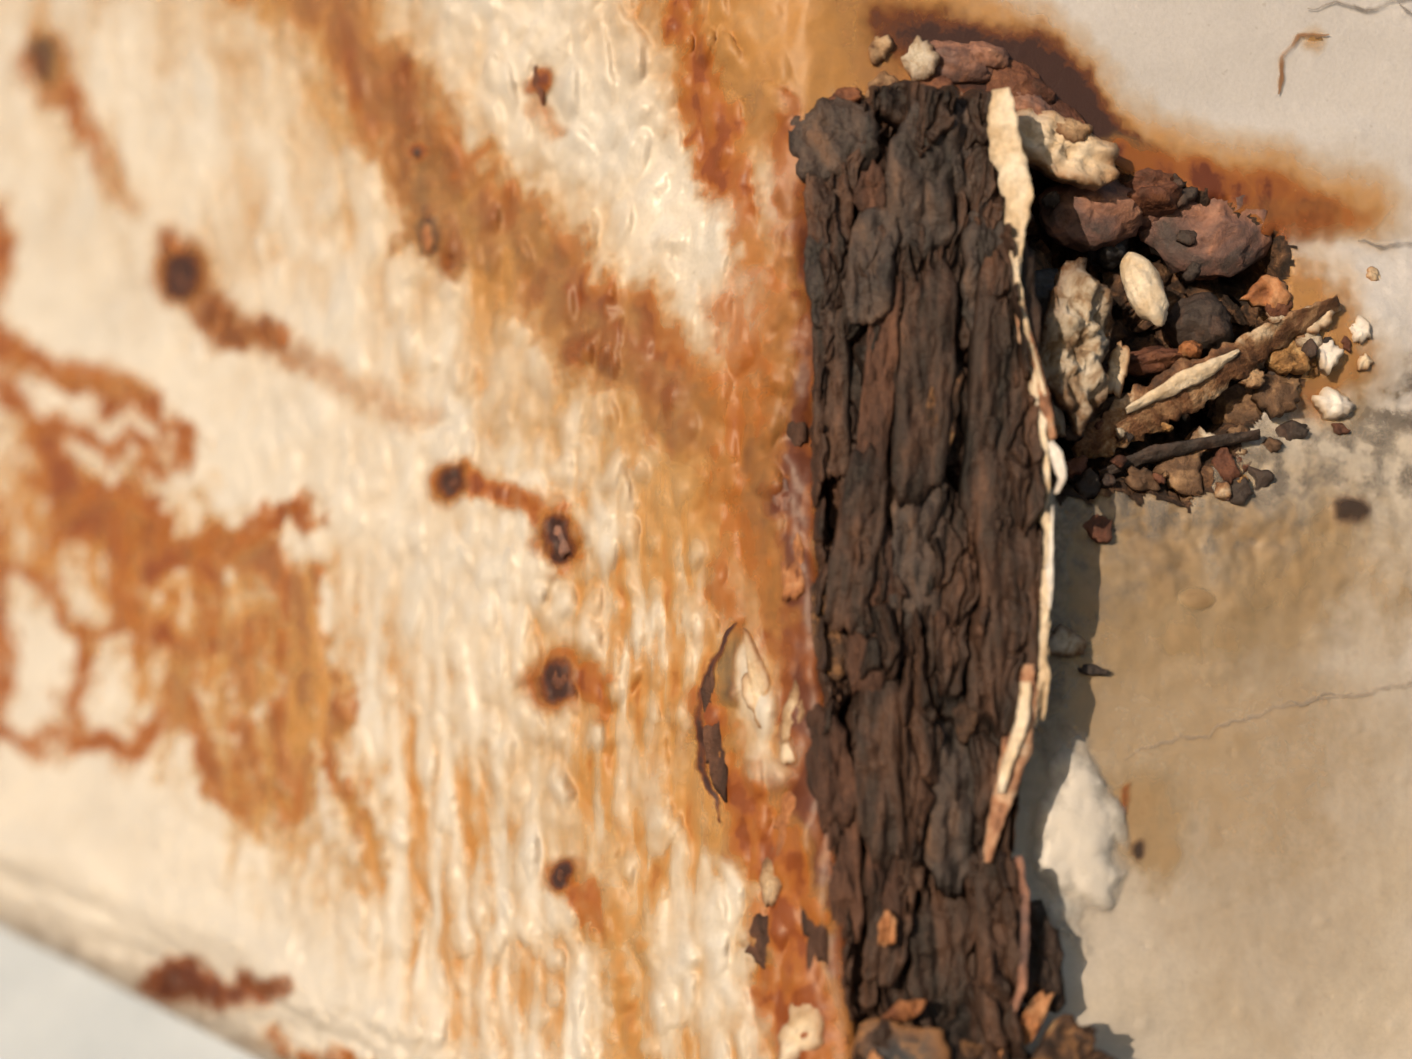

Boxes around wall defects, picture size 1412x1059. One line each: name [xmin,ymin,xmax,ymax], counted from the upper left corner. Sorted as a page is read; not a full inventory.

rust [17,24,121,195]
crack [1278,0,1412,94]
rust [0,206,16,298]
rust [154,225,314,375]
spalling [1366,266,1381,281]
spalling [828,34,1374,864]
leakage [1330,406,1412,440]
rust [260,0,1389,1059]
rust [0,319,387,899]
leakage [1034,472,1412,877]
rust [137,955,293,1012]
peeling [1011,856,1030,1013]